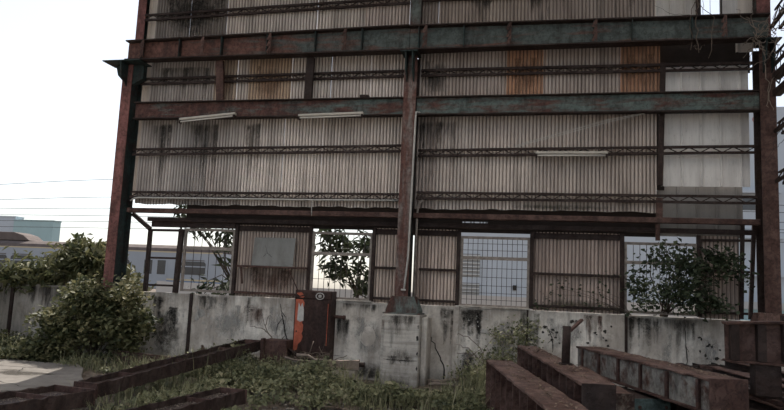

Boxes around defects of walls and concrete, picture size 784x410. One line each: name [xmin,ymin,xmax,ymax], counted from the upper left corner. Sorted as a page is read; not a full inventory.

damp [153,296,178,351]
damp [441,309,482,334]
damp [629,317,694,361]